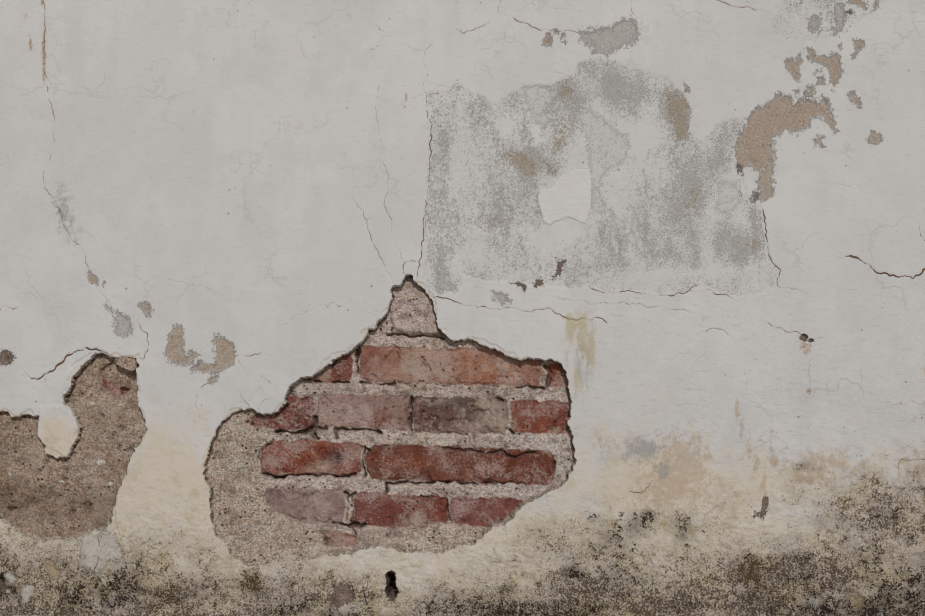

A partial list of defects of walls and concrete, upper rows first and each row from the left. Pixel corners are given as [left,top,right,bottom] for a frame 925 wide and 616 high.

peeling [541,0,879,264]
peeling [484,79,630,265]
crack [846,255,925,279]
spalling [0,349,16,367]
peeling [163,323,237,385]
flaking render [203,238,577,567]
flaking render [0,353,147,577]
leakage [589,510,654,559]
leakage [58,561,151,612]
leakage [454,581,603,616]
leakage [729,554,769,610]
leakage [766,545,925,616]